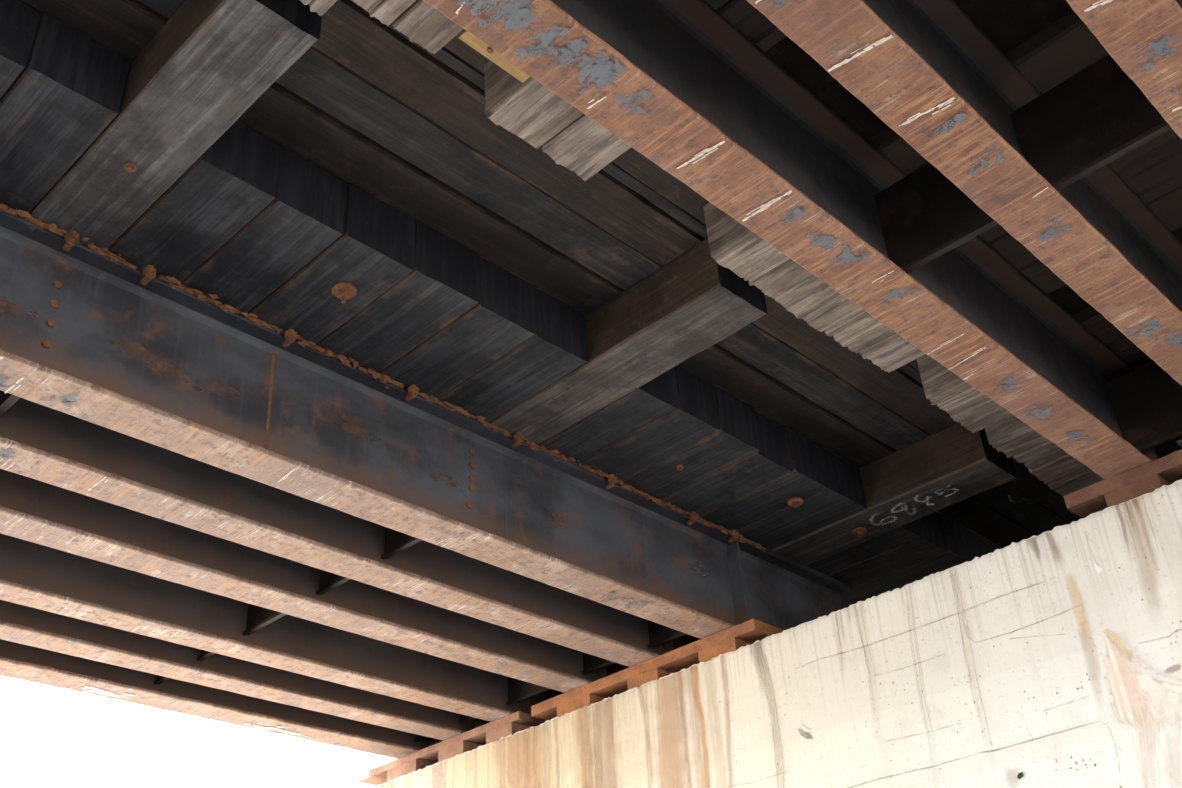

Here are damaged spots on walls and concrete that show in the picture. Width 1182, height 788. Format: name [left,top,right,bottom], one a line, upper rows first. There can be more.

peeling [457,0,651,114]
peeling [1143,34,1179,70]
peeling [779,206,804,225]
peeling [804,231,872,265]
rust [692,666,709,788]